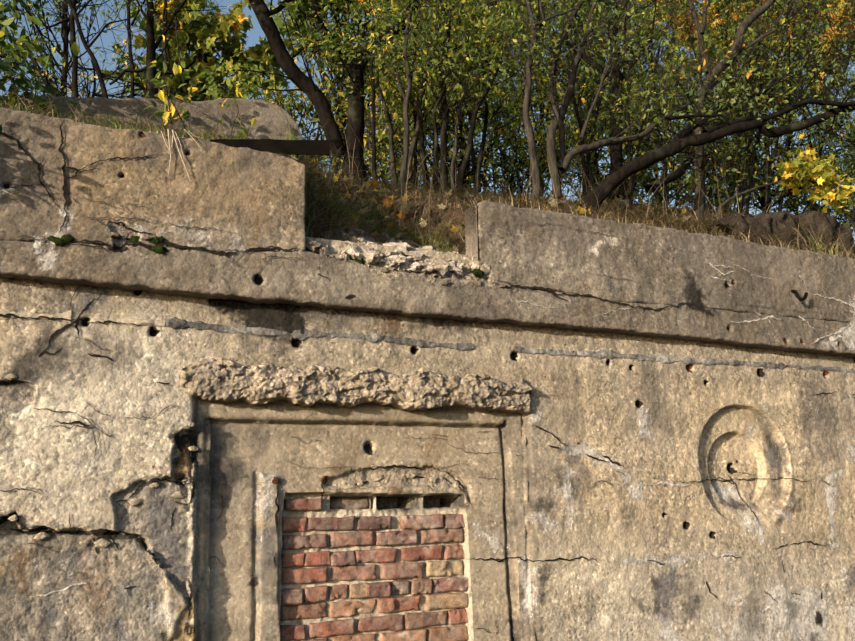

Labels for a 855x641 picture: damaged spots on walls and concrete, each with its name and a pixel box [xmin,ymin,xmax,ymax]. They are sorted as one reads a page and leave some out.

crack [1,122,311,260]
crack [0,286,164,362]
crack [494,271,713,315]
leakage [673,233,774,317]
leakage [795,262,855,362]
crack [34,382,174,459]
crack [533,424,625,476]
spalling [0,422,198,641]
leakage [474,521,508,553]
leakage [518,556,548,619]
crack [472,556,603,564]
crack [680,472,830,522]